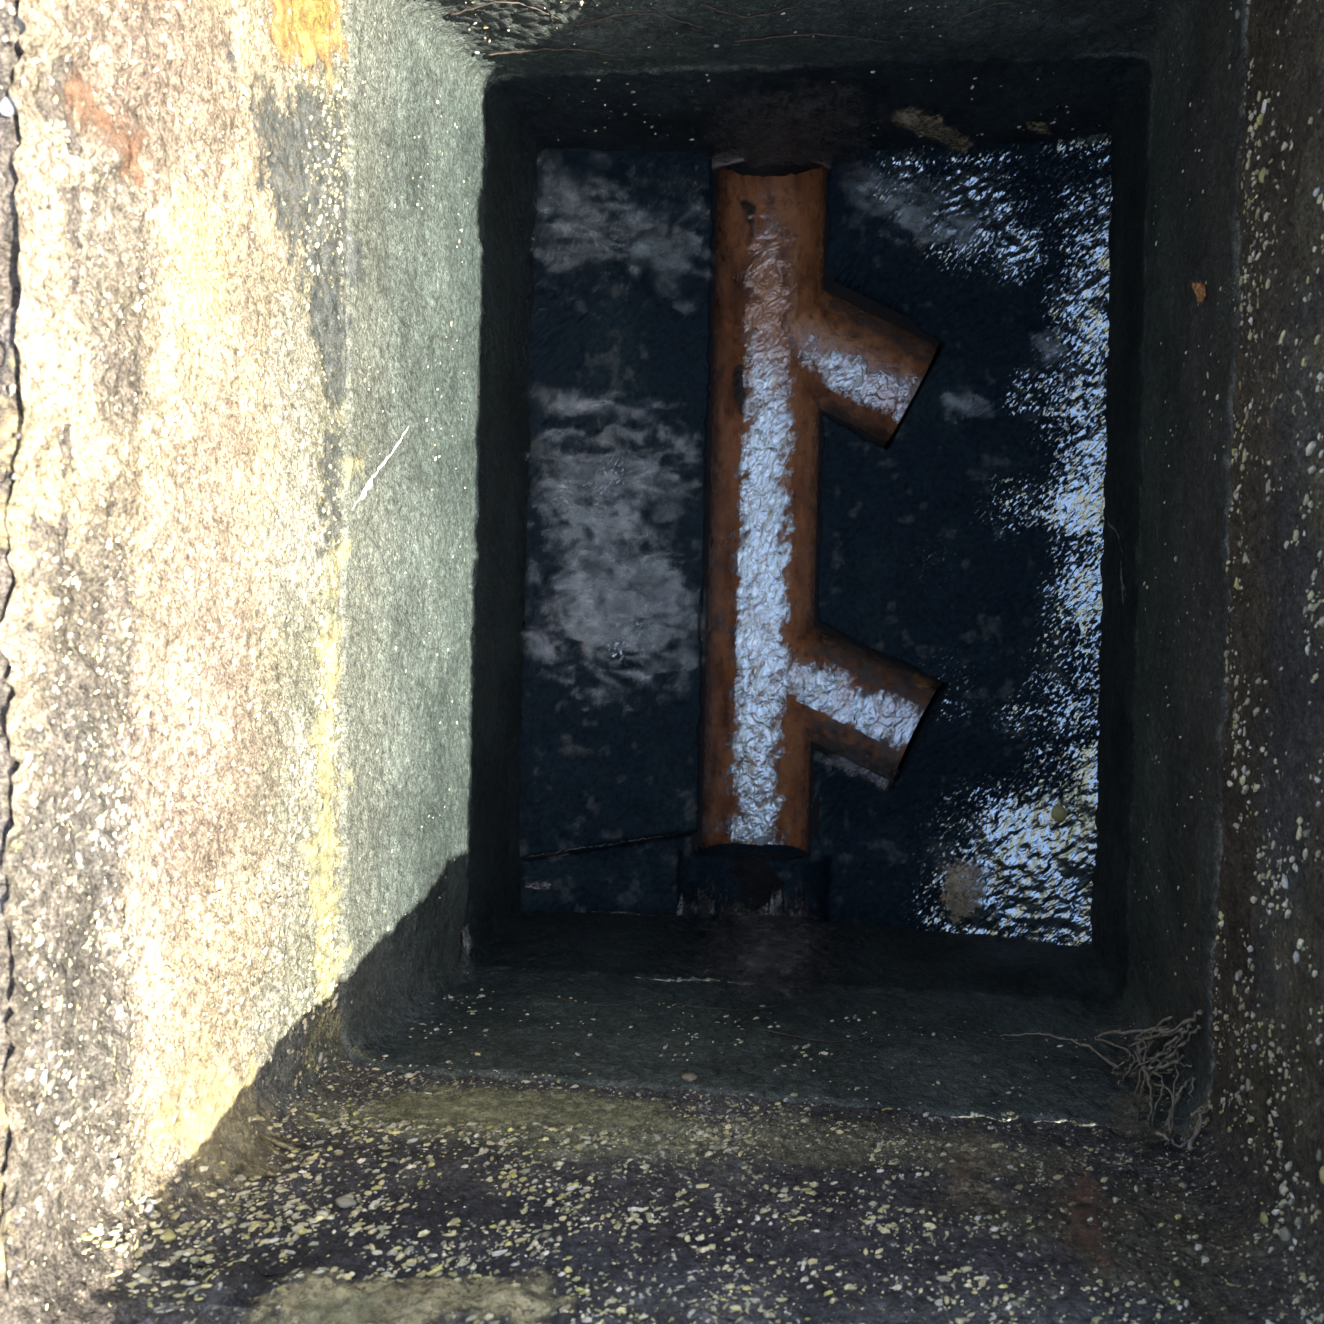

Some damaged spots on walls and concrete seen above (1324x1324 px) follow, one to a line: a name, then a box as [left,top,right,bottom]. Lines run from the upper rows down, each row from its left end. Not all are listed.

rust [271,0,348,82]
water stain [531,175,711,294]
water stain [848,176,976,246]
water stain [546,389,640,439]
water stain [540,432,694,680]
water stain [529,634,555,663]
water stain [824,749,891,790]
water stain [941,862,986,924]